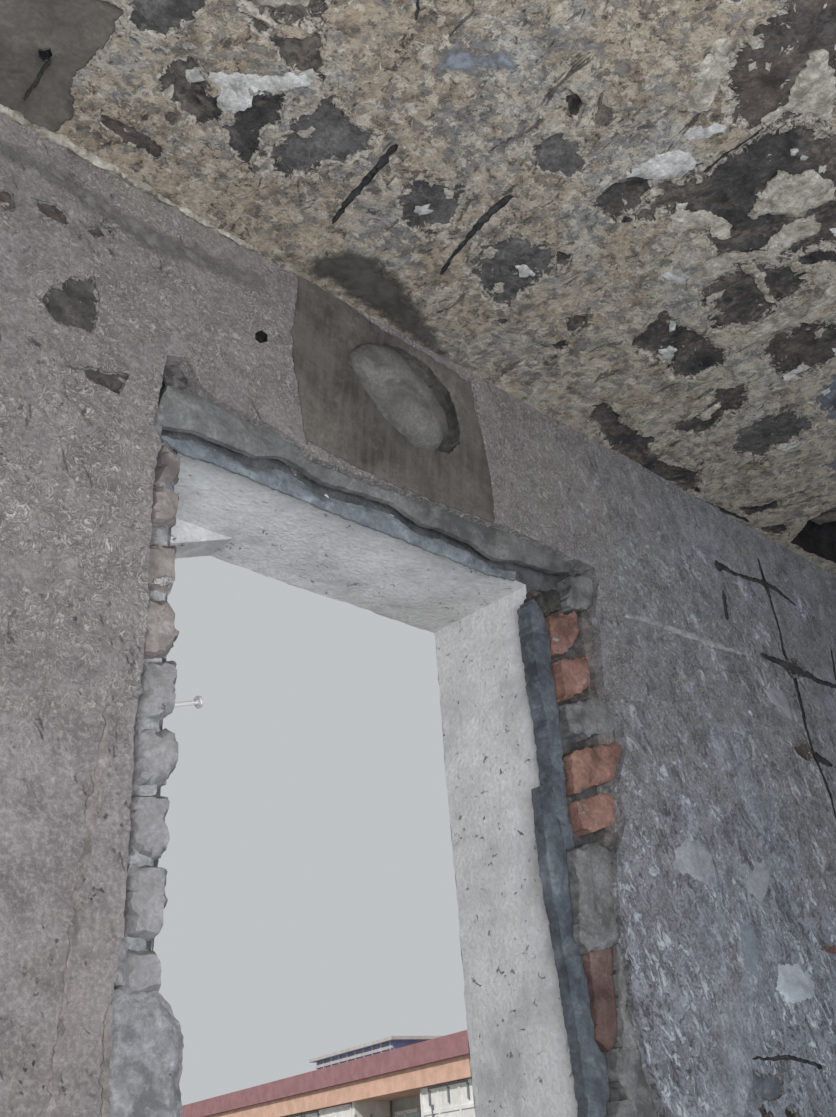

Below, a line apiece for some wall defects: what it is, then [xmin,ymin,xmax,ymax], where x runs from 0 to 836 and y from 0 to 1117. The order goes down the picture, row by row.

crack [413,0,421,20]
flaking render [149,0,382,179]
flaking render [39,276,100,333]
crack [332,144,399,224]
flaking render [394,178,466,232]
crack [440,195,514,275]
flaking render [469,232,577,312]
flaking render [591,0,836,460]
flaking render [586,402,703,495]
spalling [736,500,836,563]
crack [714,558,836,818]
flaking render [108,365,658,1117]